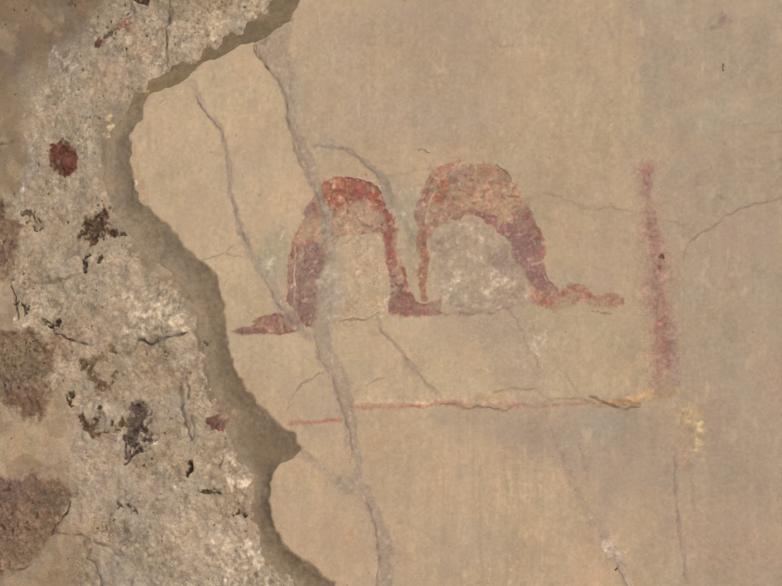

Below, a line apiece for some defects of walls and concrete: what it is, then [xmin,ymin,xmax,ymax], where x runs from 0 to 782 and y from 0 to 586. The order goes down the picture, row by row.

hole [19,212,44,233]
hole [66,203,129,265]
crack [148,0,641,586]
crack [137,330,191,347]
spalling [66,397,160,466]
hole [109,501,139,517]